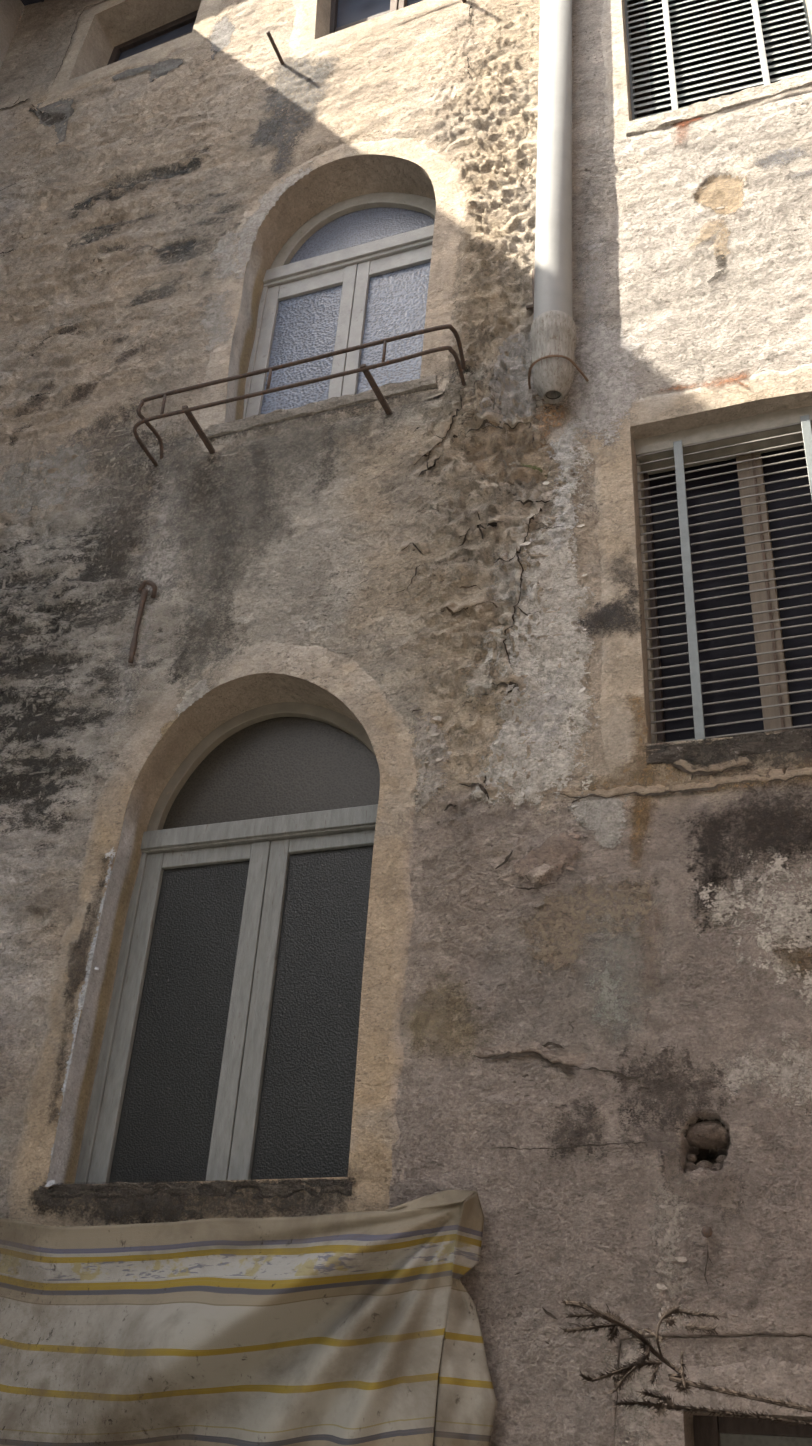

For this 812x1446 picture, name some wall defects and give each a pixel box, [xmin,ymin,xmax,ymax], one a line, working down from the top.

water stain [247,57,338,173]
crack [411,389,534,477]
water stain [0,363,473,859]
crack [396,489,564,694]
crack [444,776,504,811]
crack [554,756,812,803]
water stain [579,695,812,1010]
crack [475,1041,645,1080]
water stain [586,908,812,1132]
water stain [542,1099,609,1159]
water stain [30,1168,356,1224]